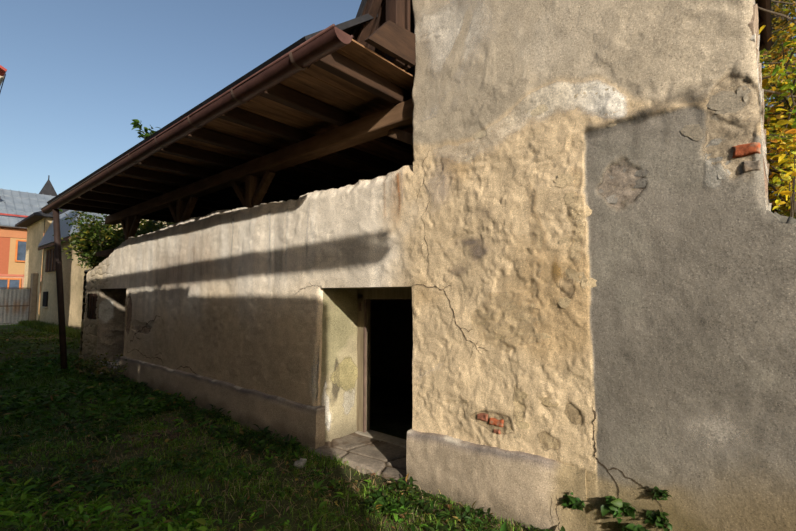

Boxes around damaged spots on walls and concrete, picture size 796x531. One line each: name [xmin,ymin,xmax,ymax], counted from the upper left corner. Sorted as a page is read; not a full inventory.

flaking render [681,4,769,189]
crack [412,151,488,357]
flaking render [471,385,530,438]
flaking render [538,431,559,450]
flaking render [538,397,582,425]
crack [592,407,669,512]